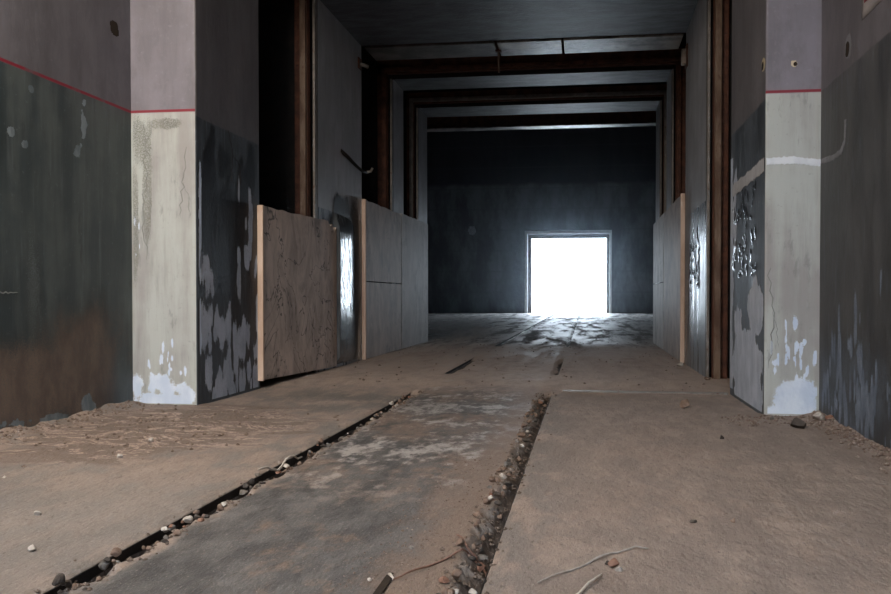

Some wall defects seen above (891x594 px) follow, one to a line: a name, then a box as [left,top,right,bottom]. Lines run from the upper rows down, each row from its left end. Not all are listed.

peeling [133,339,196,404]
damp [198,125,258,312]
peeling [198,162,259,399]
peeling [730,158,891,438]